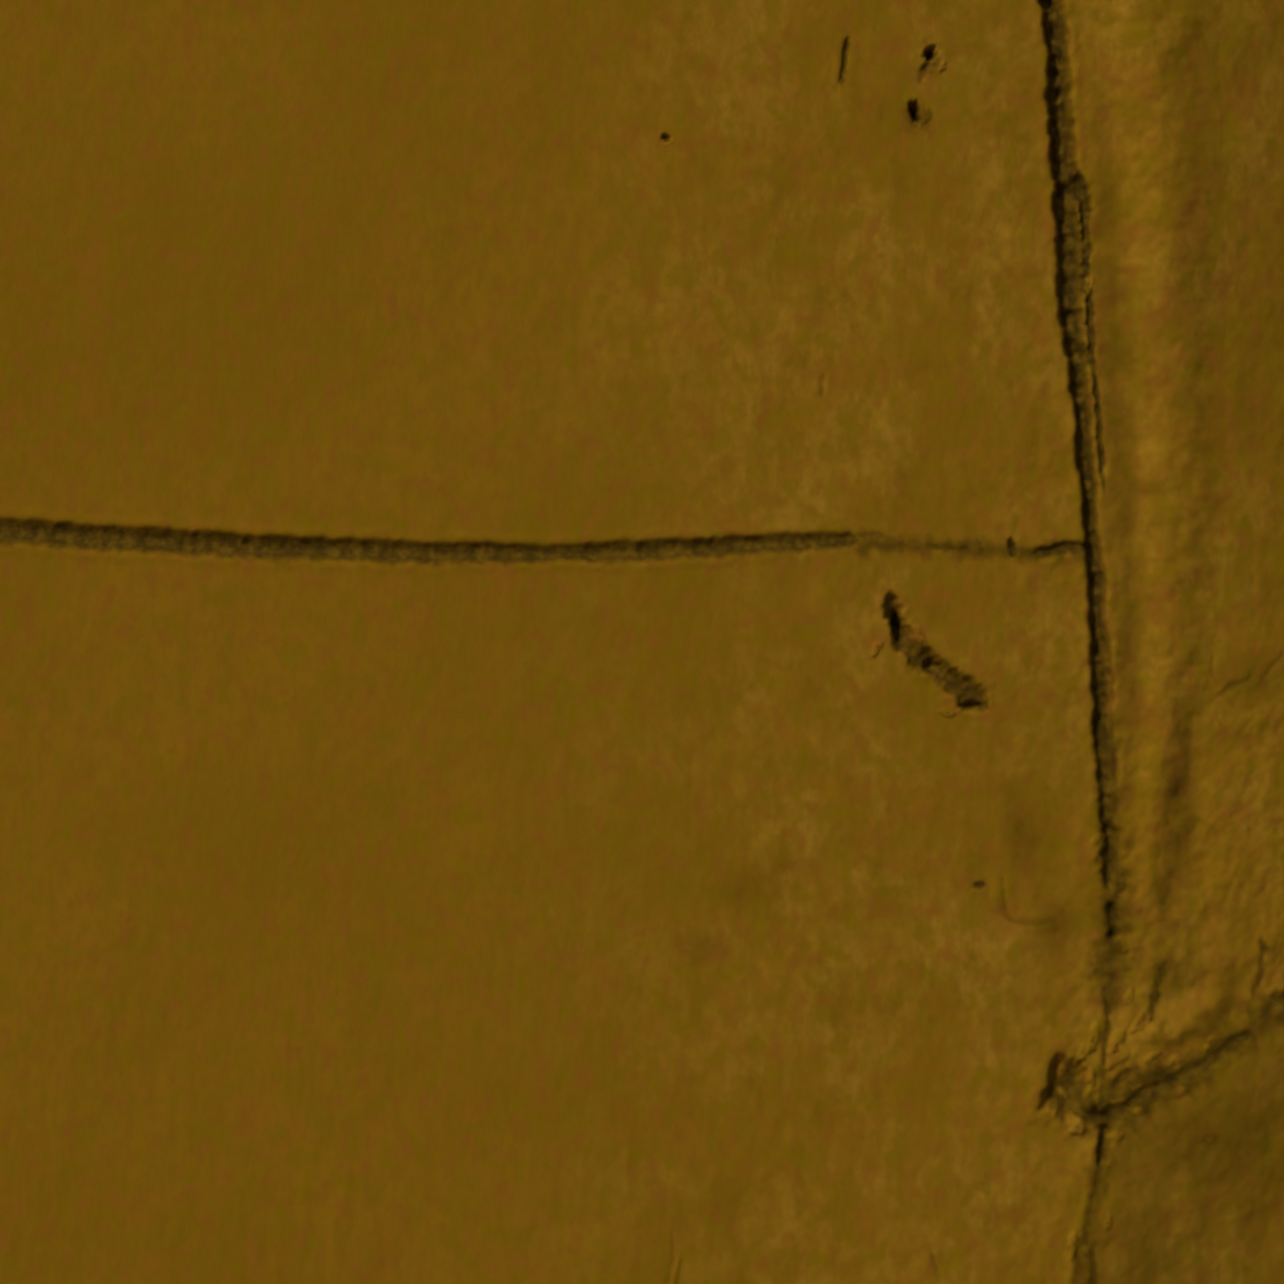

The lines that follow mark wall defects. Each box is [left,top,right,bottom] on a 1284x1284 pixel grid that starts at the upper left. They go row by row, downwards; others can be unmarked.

crack [0,520,858,564]
crack [1008,0,1129,1004]
crack [973,881,985,889]
crack [1127,936,1284,1106]